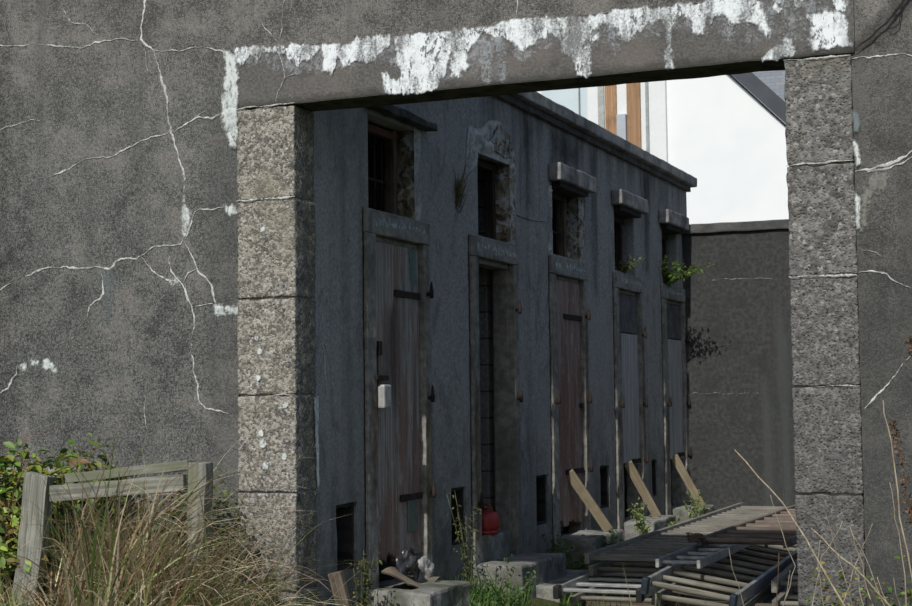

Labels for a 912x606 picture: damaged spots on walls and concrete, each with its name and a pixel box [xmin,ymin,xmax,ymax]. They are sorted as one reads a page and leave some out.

peeling [234,0,852,95]
crack [855,150,912,172]
crack [0,0,228,414]
crack [858,250,910,288]
crack [865,356,911,408]